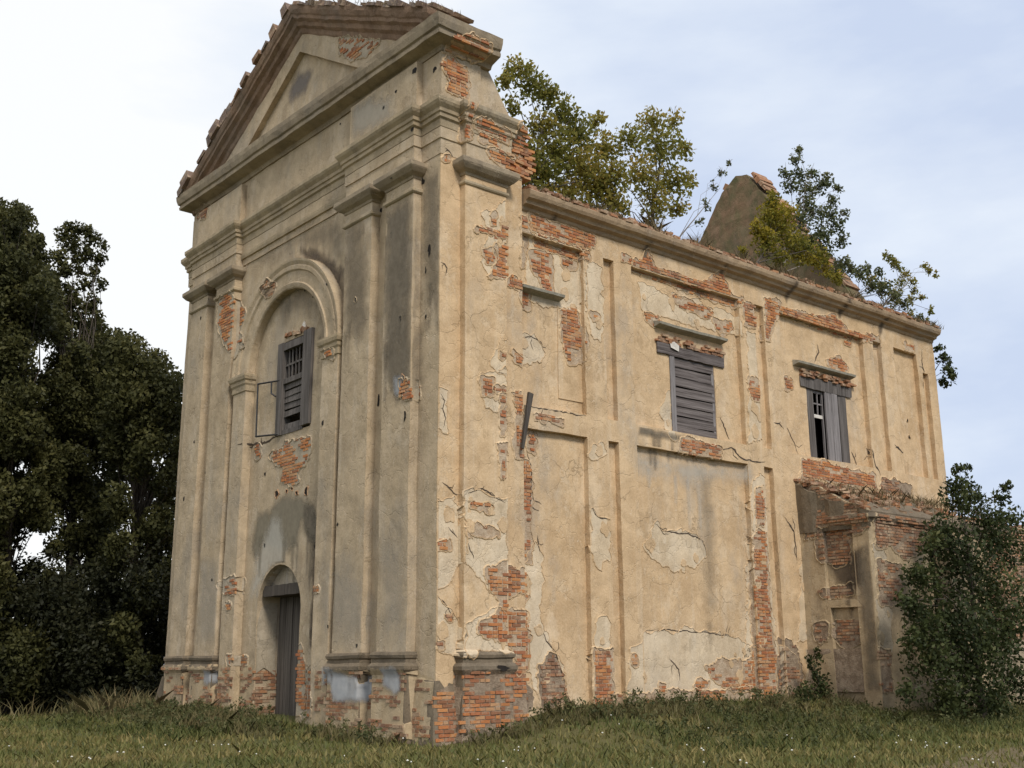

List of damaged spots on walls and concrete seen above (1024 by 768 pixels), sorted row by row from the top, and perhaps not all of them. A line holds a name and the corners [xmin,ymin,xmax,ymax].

spalling [440,31,536,184]
spalling [216,290,247,360]
peeling [472,200,605,367]
peeling [620,248,882,444]
spalling [254,434,313,499]
water stain [253,497,316,647]
peeling [295,331,571,745]
crack [658,526,707,556]
peeling [583,472,865,707]
spalling [797,457,936,694]
spalling [161,653,255,711]